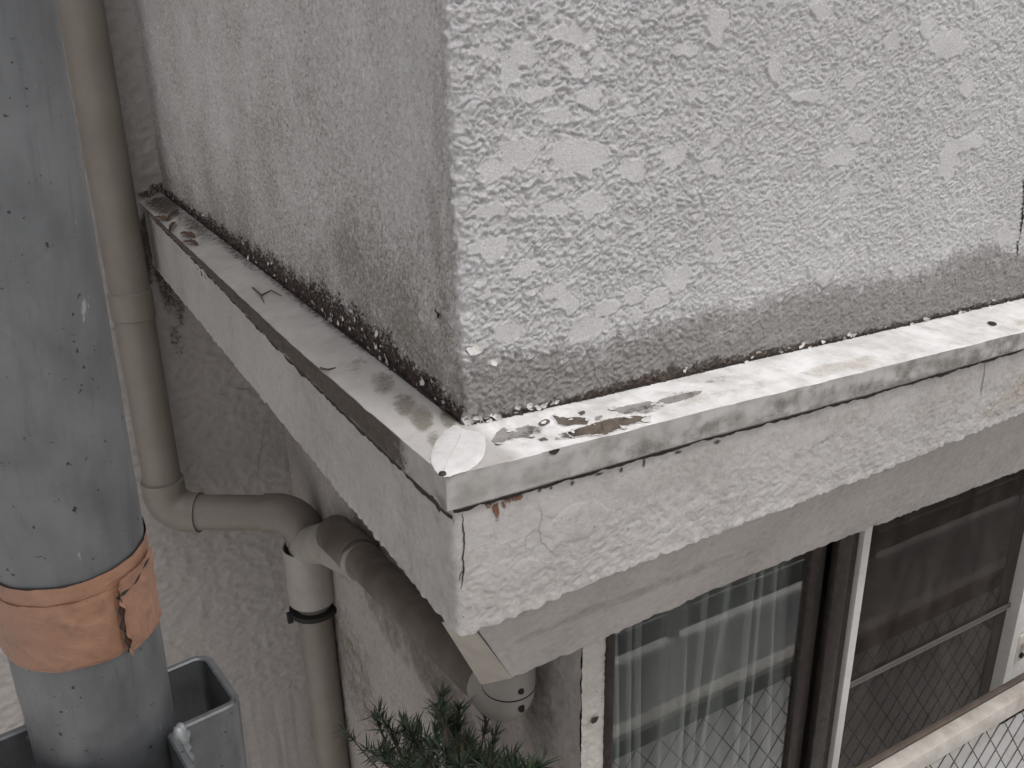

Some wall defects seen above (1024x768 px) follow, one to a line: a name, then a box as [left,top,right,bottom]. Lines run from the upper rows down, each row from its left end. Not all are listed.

crack [1016,183,1024,264]
peeling [466,343,498,366]
leakage [138,182,1024,469]
peeling [461,391,702,455]
corrosion [485,495,523,521]
crack [458,515,466,589]